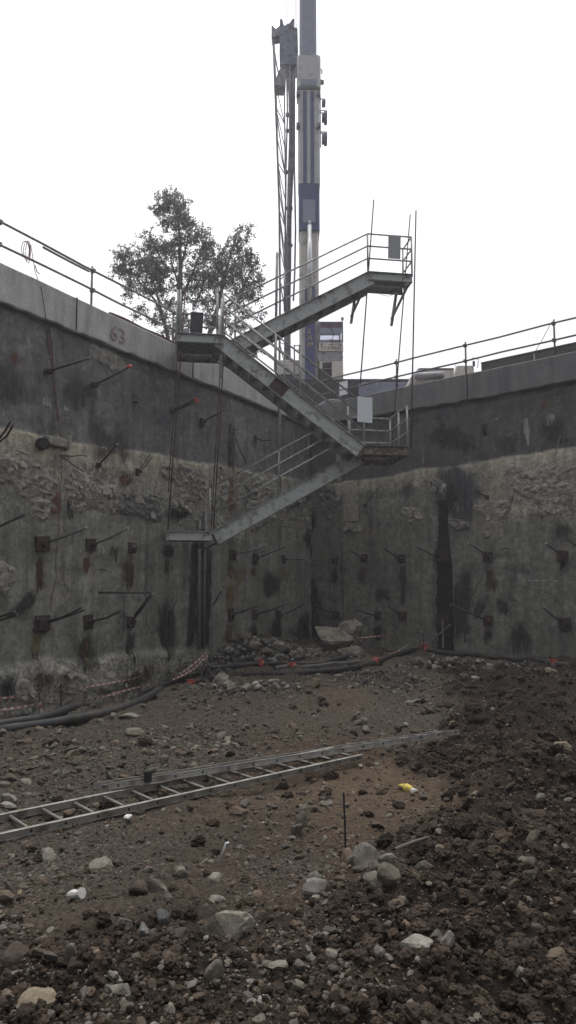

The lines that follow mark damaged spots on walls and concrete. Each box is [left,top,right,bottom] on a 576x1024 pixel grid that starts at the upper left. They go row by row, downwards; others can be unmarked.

water stain [158,542,211,661]